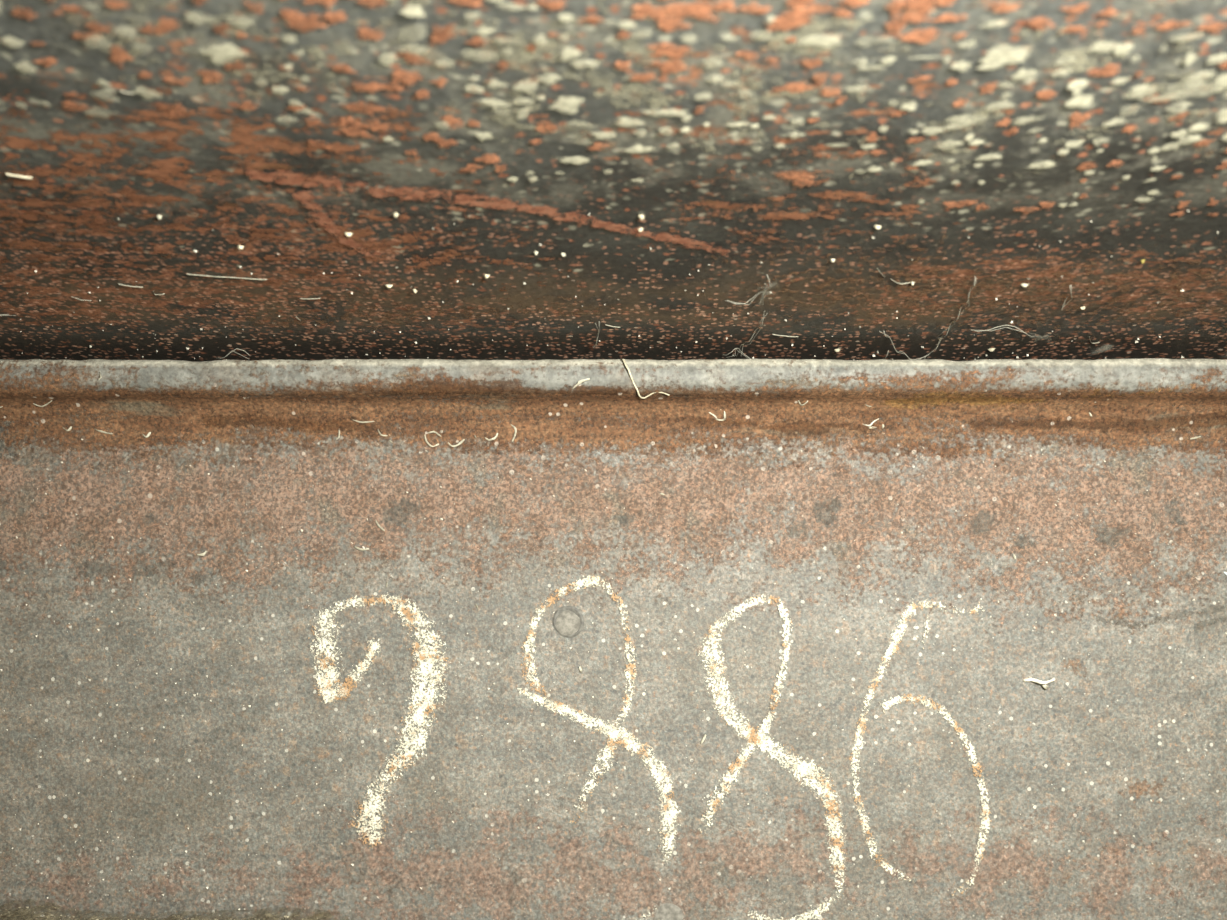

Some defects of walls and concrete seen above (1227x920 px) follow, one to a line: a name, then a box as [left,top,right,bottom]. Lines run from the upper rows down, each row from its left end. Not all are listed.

rust [885,0,968,43]
rust [993,1,1119,33]
rust [1130,20,1227,35]
rust [1091,63,1120,77]
rust [947,78,998,107]
rust [1037,90,1057,100]
rust [0,0,945,300]
rust [943,200,989,225]
rust [1014,202,1055,214]
rust [1077,160,1123,199]
rust [1169,174,1191,217]
rust [0,360,1227,635]